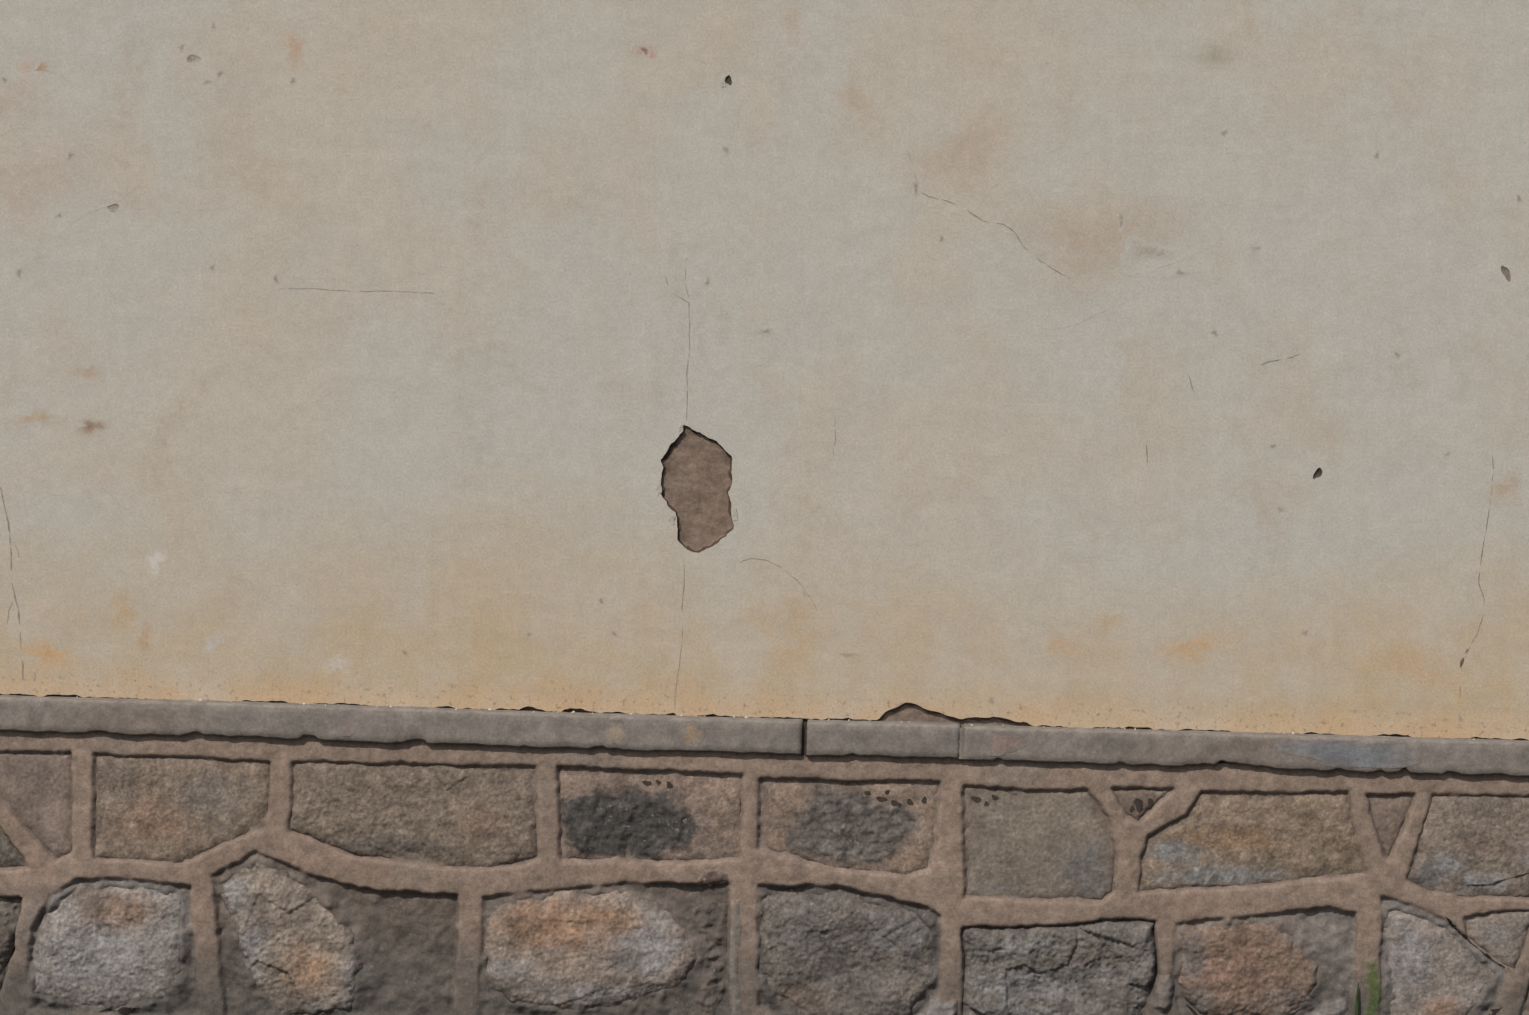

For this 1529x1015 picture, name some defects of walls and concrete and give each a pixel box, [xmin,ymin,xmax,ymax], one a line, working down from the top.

crack [907,151,1069,278]
crack [0,486,35,682]
flaking render [656,425,737,553]
damp [0,424,1529,768]